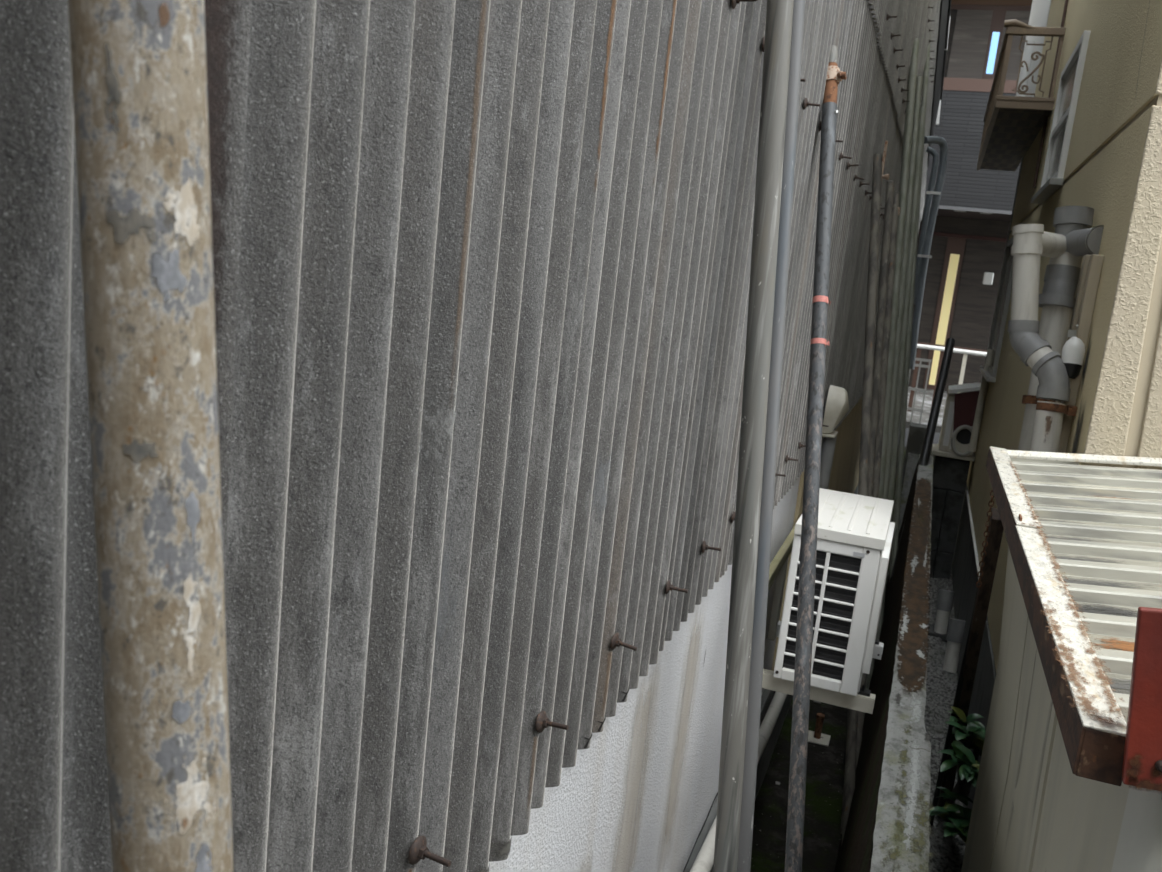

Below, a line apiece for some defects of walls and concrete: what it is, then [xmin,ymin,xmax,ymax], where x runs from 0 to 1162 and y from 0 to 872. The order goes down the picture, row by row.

peeling [104,43,122,134]
rust [598,0,616,156]
peeling [106,209,157,244]
peeling [163,178,203,247]
rust [1008,461,1135,727]
water stain [667,634,699,830]
rust [1126,755,1162,793]